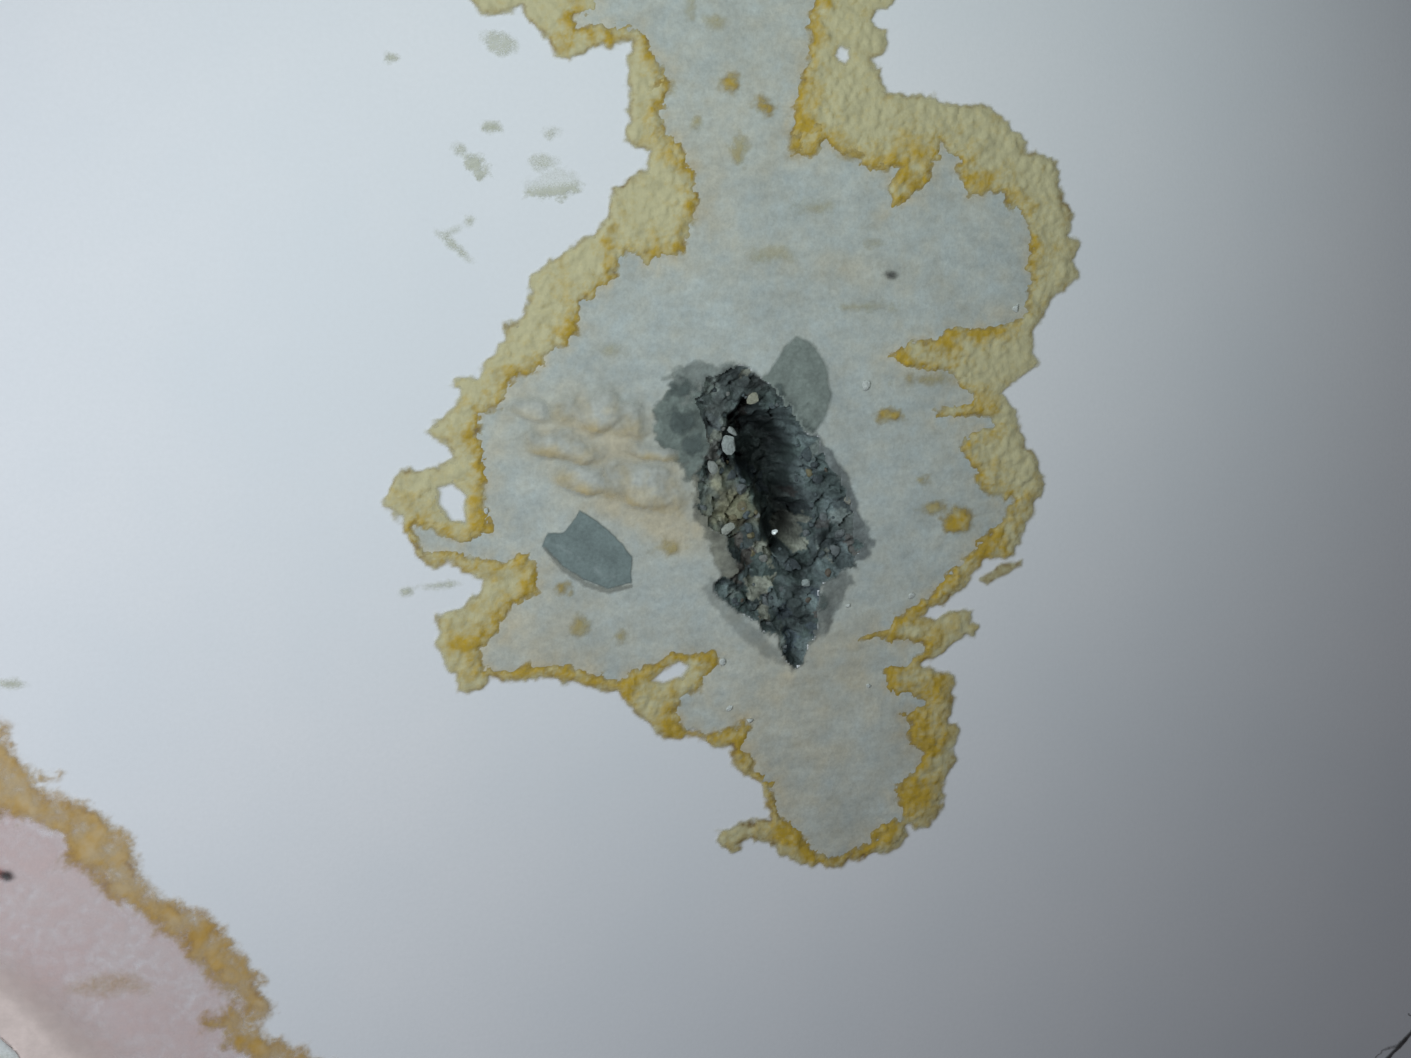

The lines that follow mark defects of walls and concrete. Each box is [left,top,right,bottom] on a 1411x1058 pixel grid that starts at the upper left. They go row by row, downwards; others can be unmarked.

spalling [542,511,632,593]
leakage [383,0,1080,868]
spalling [653,337,874,669]
leakage [0,726,308,1058]